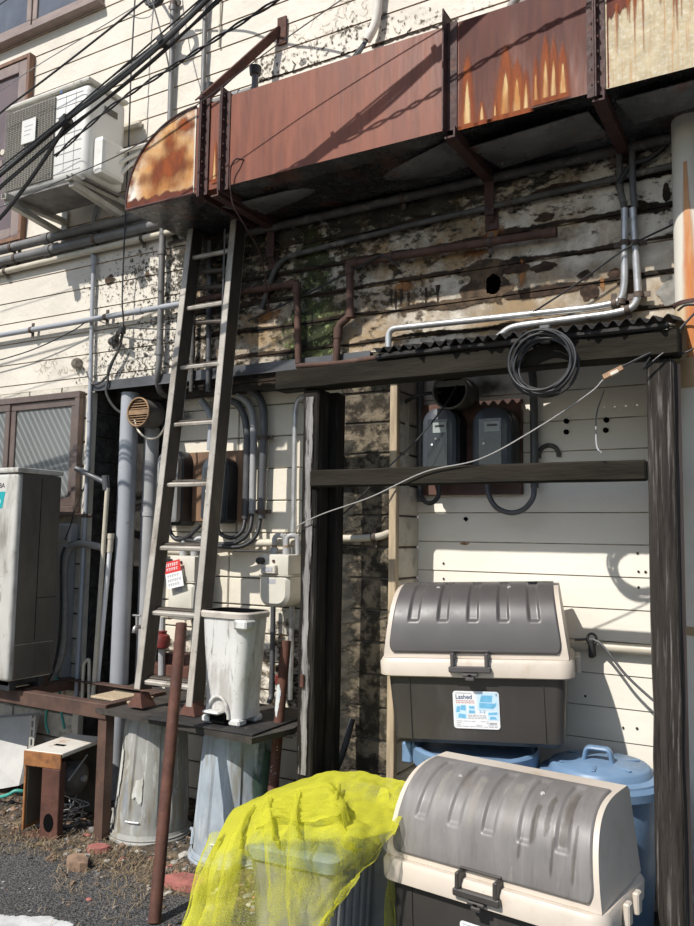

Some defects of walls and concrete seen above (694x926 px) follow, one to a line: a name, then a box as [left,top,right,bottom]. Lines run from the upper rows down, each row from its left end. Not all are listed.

rust [459,0,587,130]
rust [606,0,643,88]
rust [127,110,194,208]
damp [76,235,186,383]
damp [188,230,230,371]
damp [235,147,673,365]
spalling [426,258,599,310]
spalling [534,212,555,222]
spalling [607,268,634,294]
peeling [656,274,675,306]
rust [683,161,694,358]